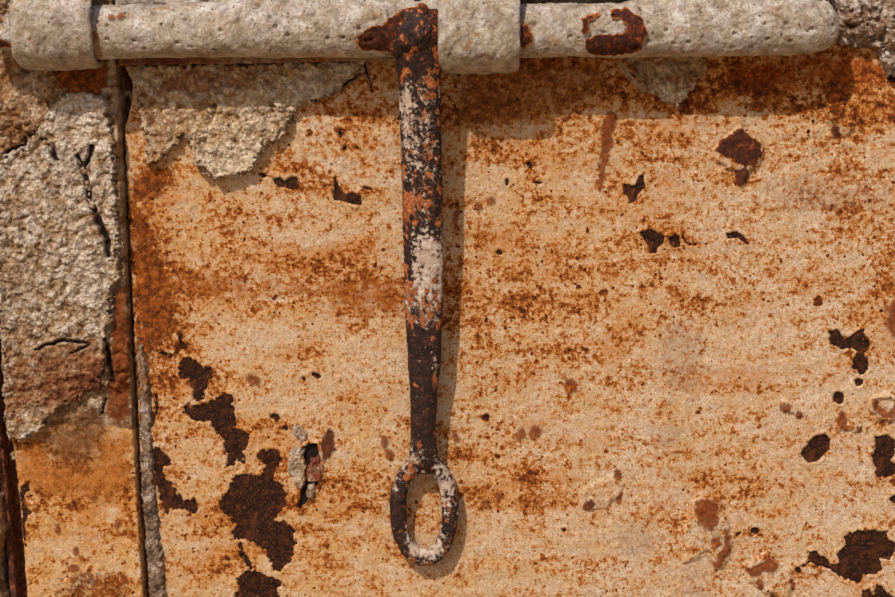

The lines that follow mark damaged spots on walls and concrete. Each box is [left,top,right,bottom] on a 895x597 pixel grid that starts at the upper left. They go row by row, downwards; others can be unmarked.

corrosion [581,7,648,56]
peeling [130,61,365,190]
corrosion [596,111,617,191]
corrosion [712,123,765,187]
corrosion [732,51,883,139]
crack [5,137,110,257]
corrosion [105,165,246,426]
crack [35,338,115,413]
corrosion [321,428,337,462]
corrosion [679,492,734,571]
corrosion [55,546,129,597]
corrosion [742,550,797,597]